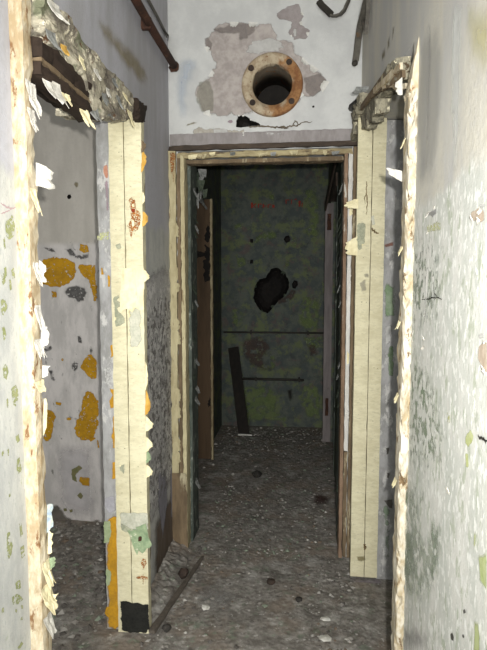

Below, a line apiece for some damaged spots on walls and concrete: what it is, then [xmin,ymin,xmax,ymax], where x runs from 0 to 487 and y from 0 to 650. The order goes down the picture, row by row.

peeling [25,78,42,133]
flaking render [30,0,135,130]
peeling [193,4,329,136]
flaking render [348,56,412,142]
peeling [33,244,110,302]
spalling [253,268,298,313]
peeling [34,305,61,441]
peeling [72,350,97,379]
peeling [67,391,99,448]
peeling [71,466,90,486]